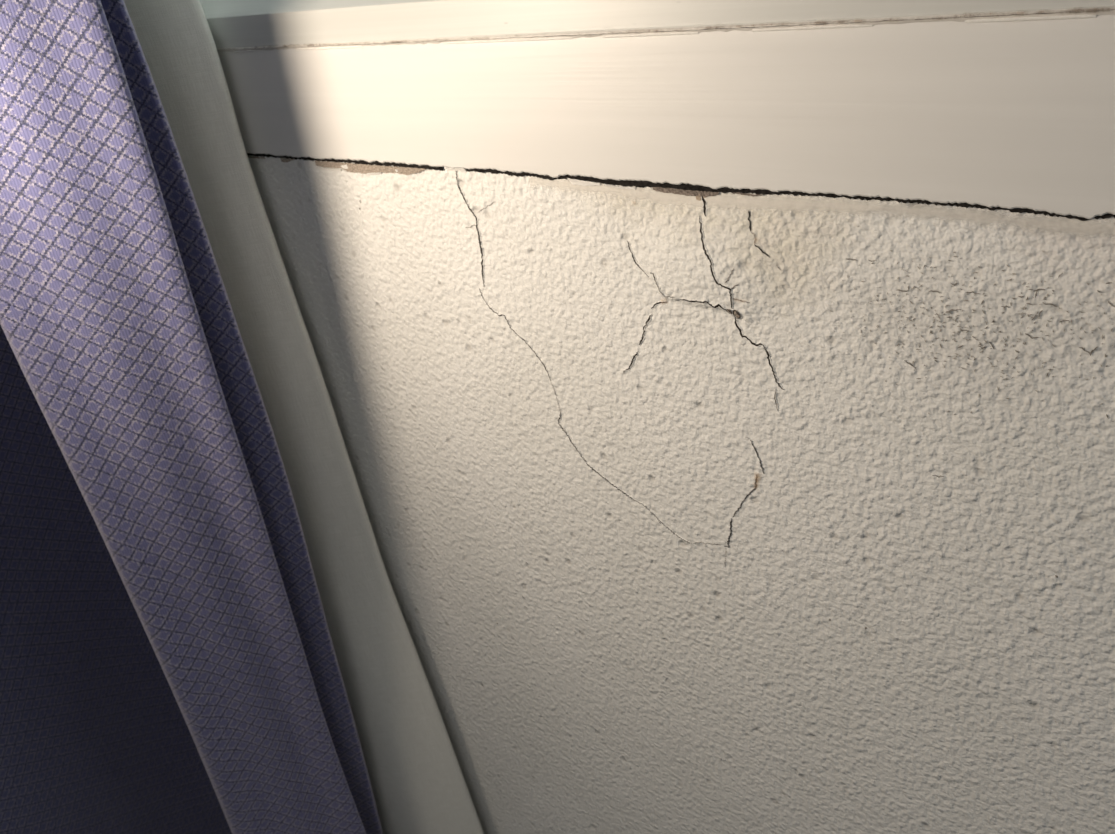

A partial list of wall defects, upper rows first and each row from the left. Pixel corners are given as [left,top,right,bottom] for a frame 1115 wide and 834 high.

crack [247,153,1115,564]